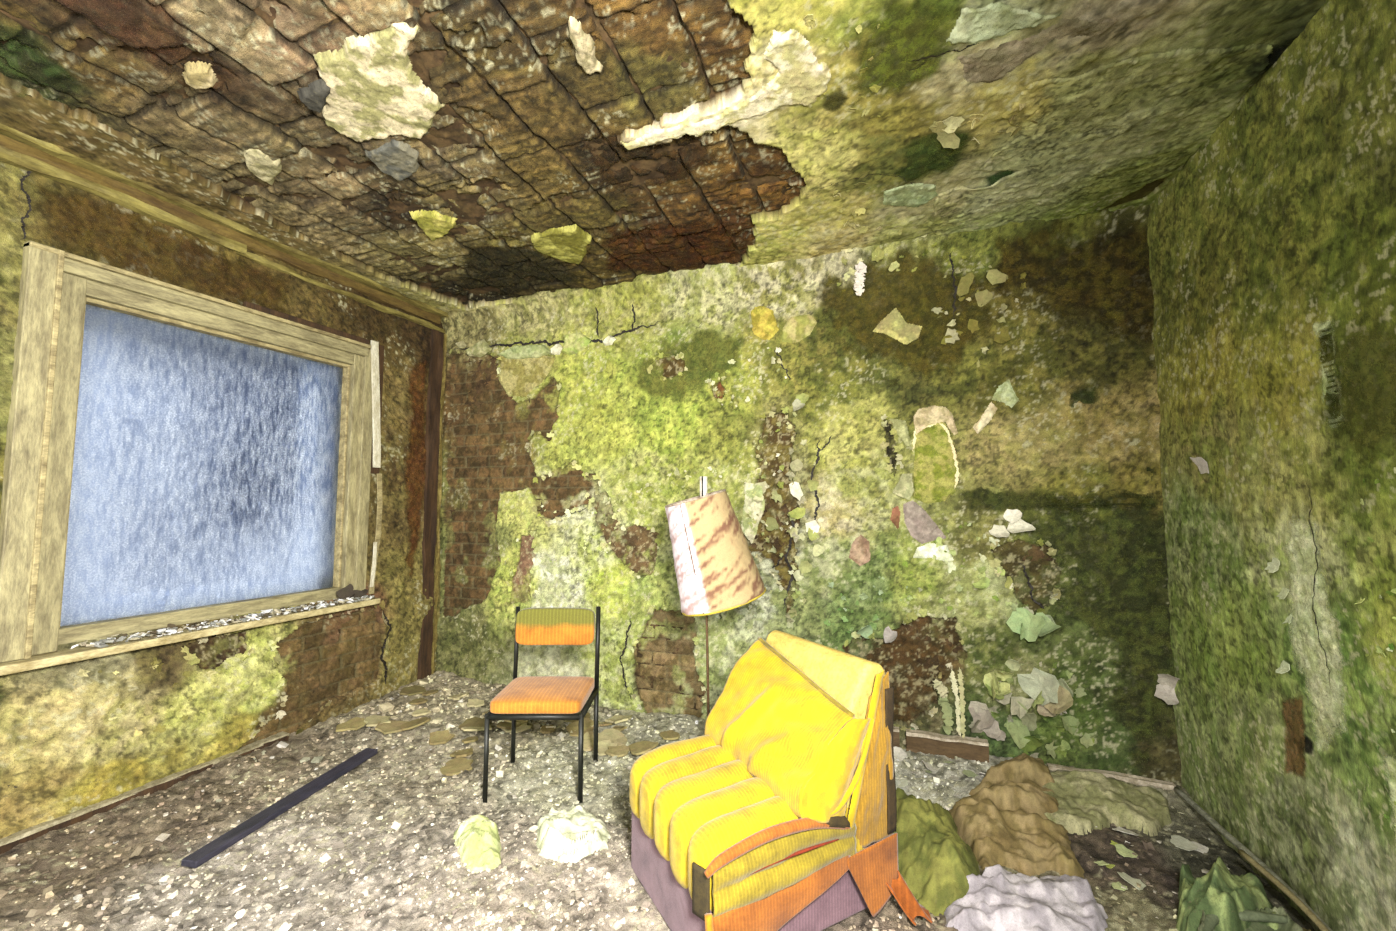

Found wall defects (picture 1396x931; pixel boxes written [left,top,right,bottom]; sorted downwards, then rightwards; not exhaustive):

crack [454,304,663,350]
leakage [589,131,716,191]
leakage [602,222,747,272]
peeling [620,14,880,150]
leakage [821,223,1154,378]
peeling [0,600,391,830]
spalling [443,349,722,617]
spalling [624,605,707,719]
spalling [705,306,825,629]
flaking render [824,379,1157,773]
leakage [961,487,1177,759]
leakage [1288,523,1343,748]